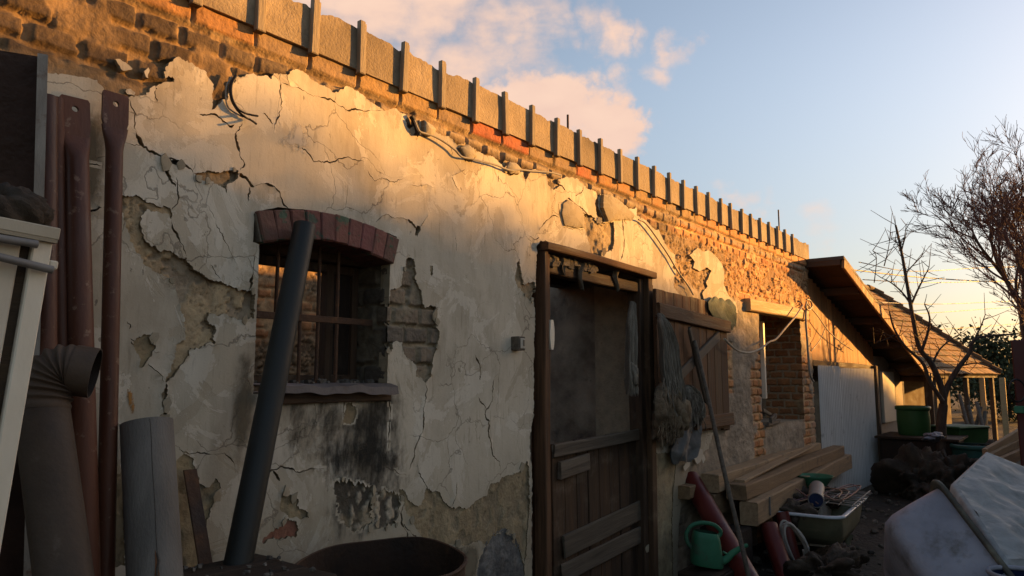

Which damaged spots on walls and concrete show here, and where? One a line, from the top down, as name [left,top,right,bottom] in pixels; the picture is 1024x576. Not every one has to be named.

flaking render [0,0,816,576]